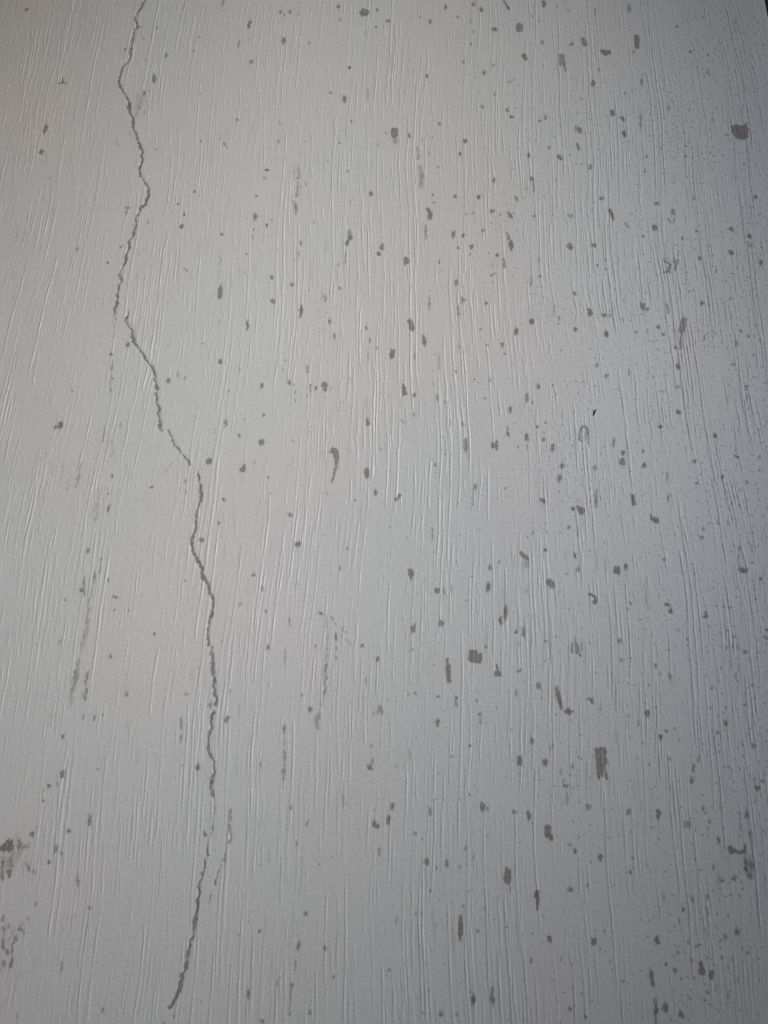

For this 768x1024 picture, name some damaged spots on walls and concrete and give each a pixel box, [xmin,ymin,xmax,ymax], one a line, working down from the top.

crack [114,0,217,797]
crack [168,849,225,1009]